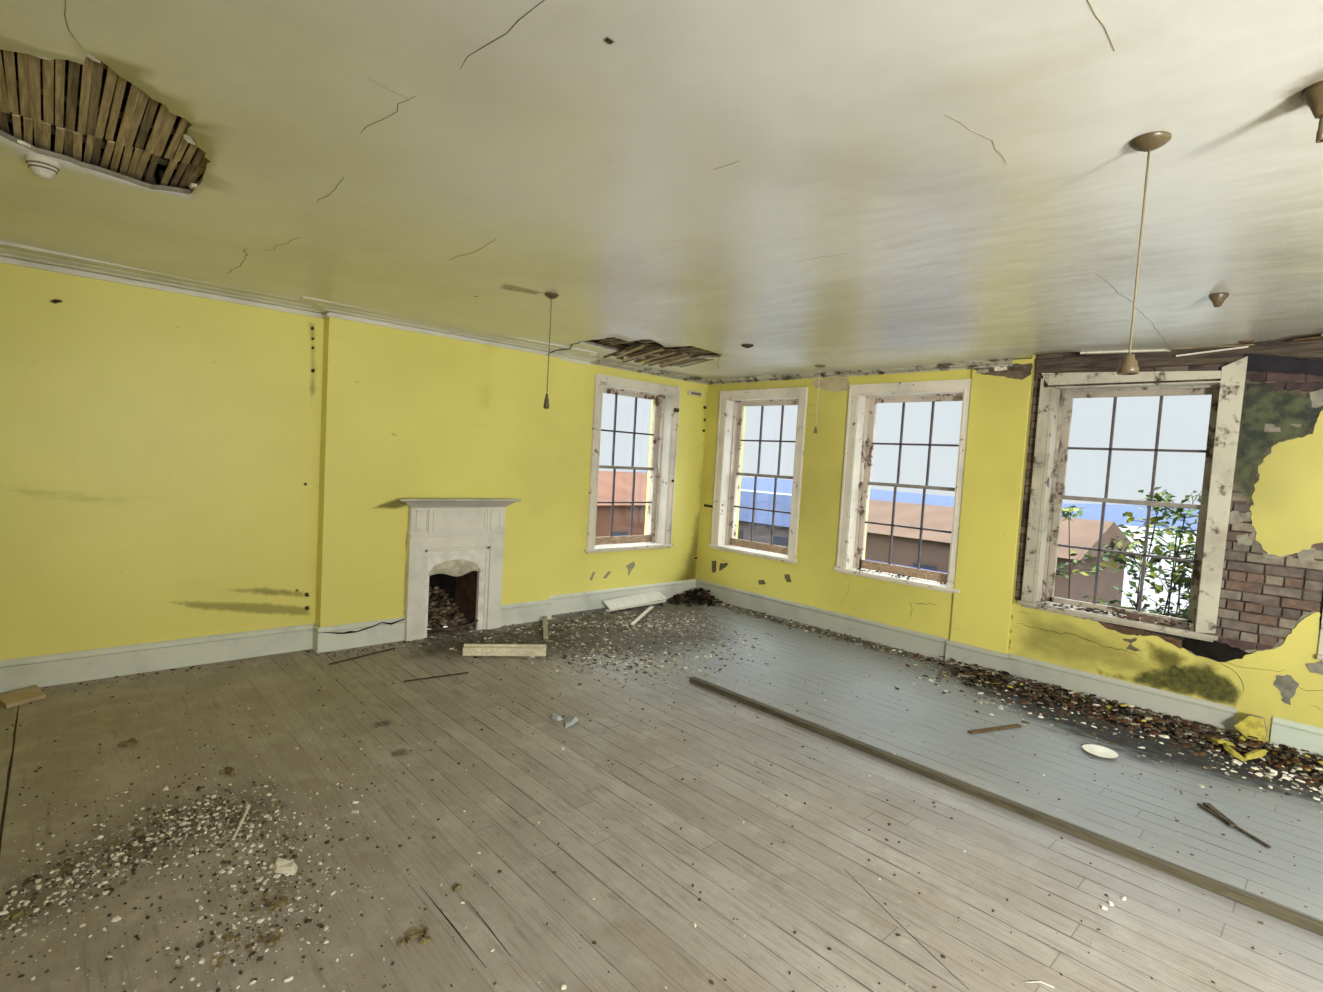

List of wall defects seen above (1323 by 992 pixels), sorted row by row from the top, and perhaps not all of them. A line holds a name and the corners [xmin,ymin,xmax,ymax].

crack [64,0,82,47]
crack [461,0,545,68]
crack [1088,0,1115,50]
crack [360,77,415,134]
spalling [1245,372,1323,408]
water stain [1236,383,1323,496]
spalling [1264,424,1301,432]
spalling [1098,483,1323,662]
water stain [1135,650,1238,703]
spalling [1273,675,1299,705]
spalling [1306,662,1323,675]